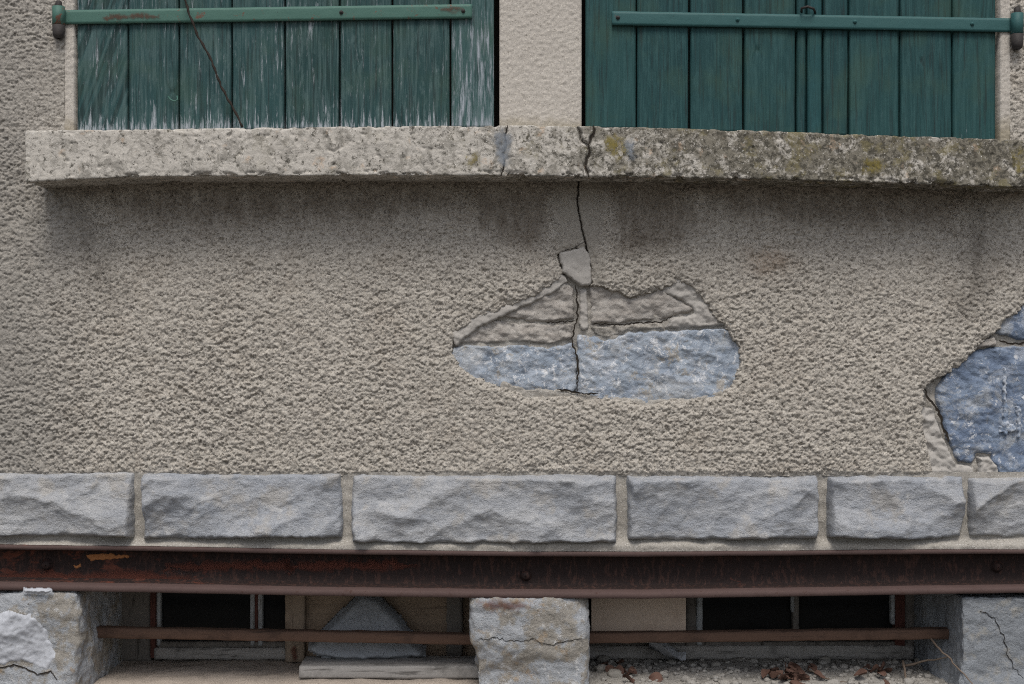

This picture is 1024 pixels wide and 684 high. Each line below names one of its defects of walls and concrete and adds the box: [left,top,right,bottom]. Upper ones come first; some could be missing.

crack [557,125,595,256]
flaking render [452,257,740,406]
flaking render [921,305,1024,472]
peeling [0,610,56,670]
peeling [23,587,52,595]